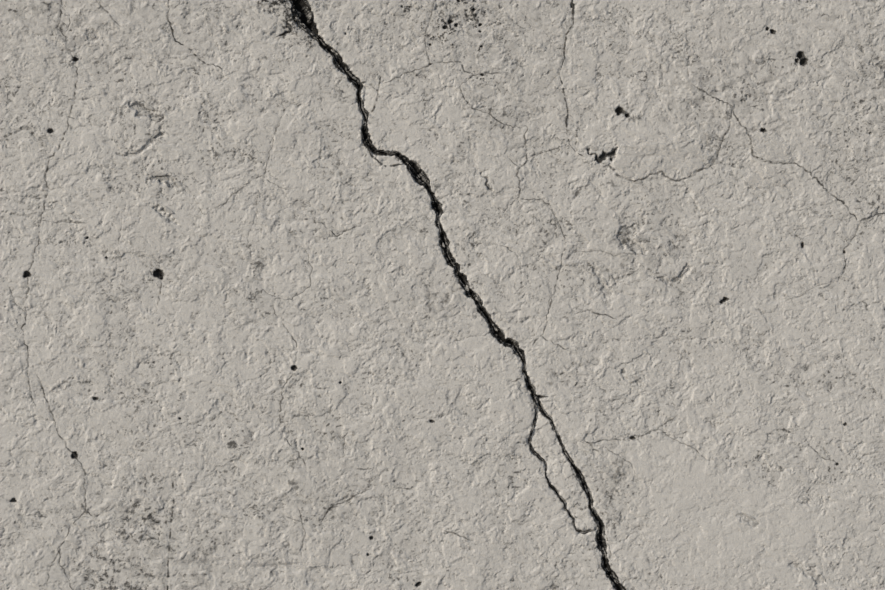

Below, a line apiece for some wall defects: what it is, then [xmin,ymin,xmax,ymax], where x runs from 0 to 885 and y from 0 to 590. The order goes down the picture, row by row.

crack [276,0,626,590]